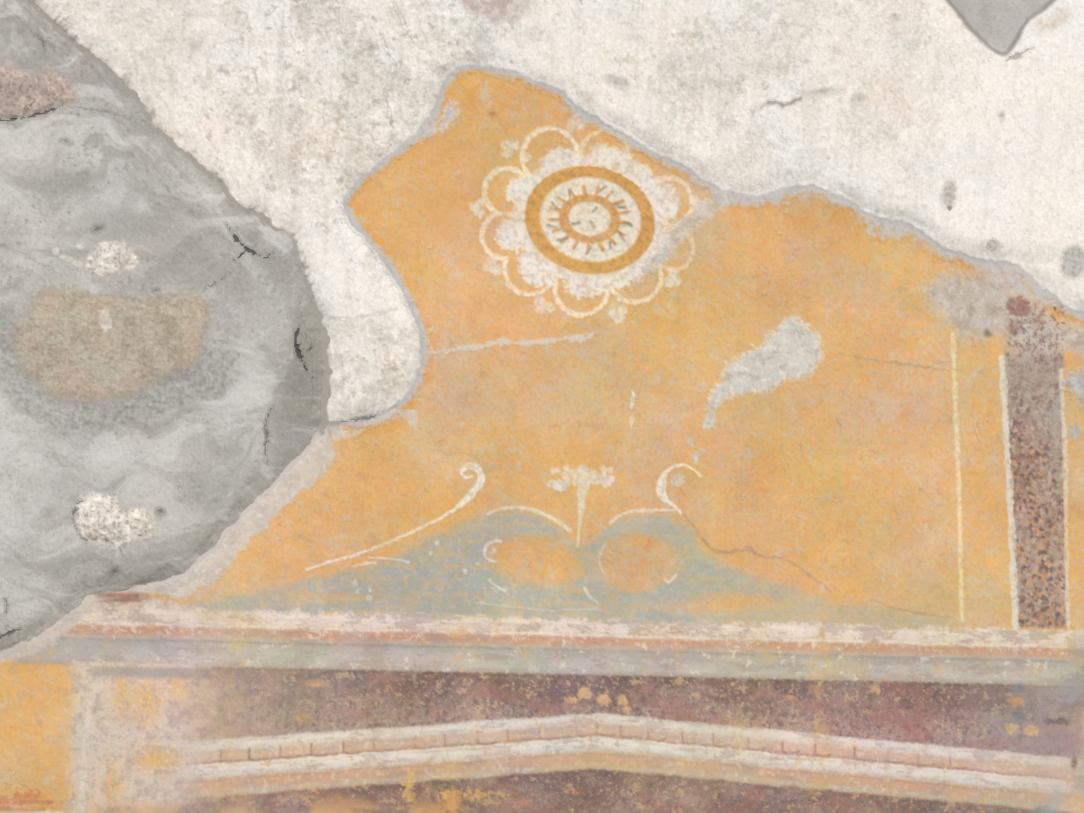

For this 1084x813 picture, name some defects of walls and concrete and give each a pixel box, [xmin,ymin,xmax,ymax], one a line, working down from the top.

flaking render [0,59,82,126]
spalling [794,84,871,107]
crack [199,220,276,295]
peeling [636,180,745,279]
spalling [937,175,960,215]
spalling [1058,242,1084,282]
flaking render [7,239,218,410]
crack [291,306,399,374]
peeling [684,313,828,467]
peeling [1057,363,1084,441]
spalling [0,409,421,668]
crack [679,512,833,593]